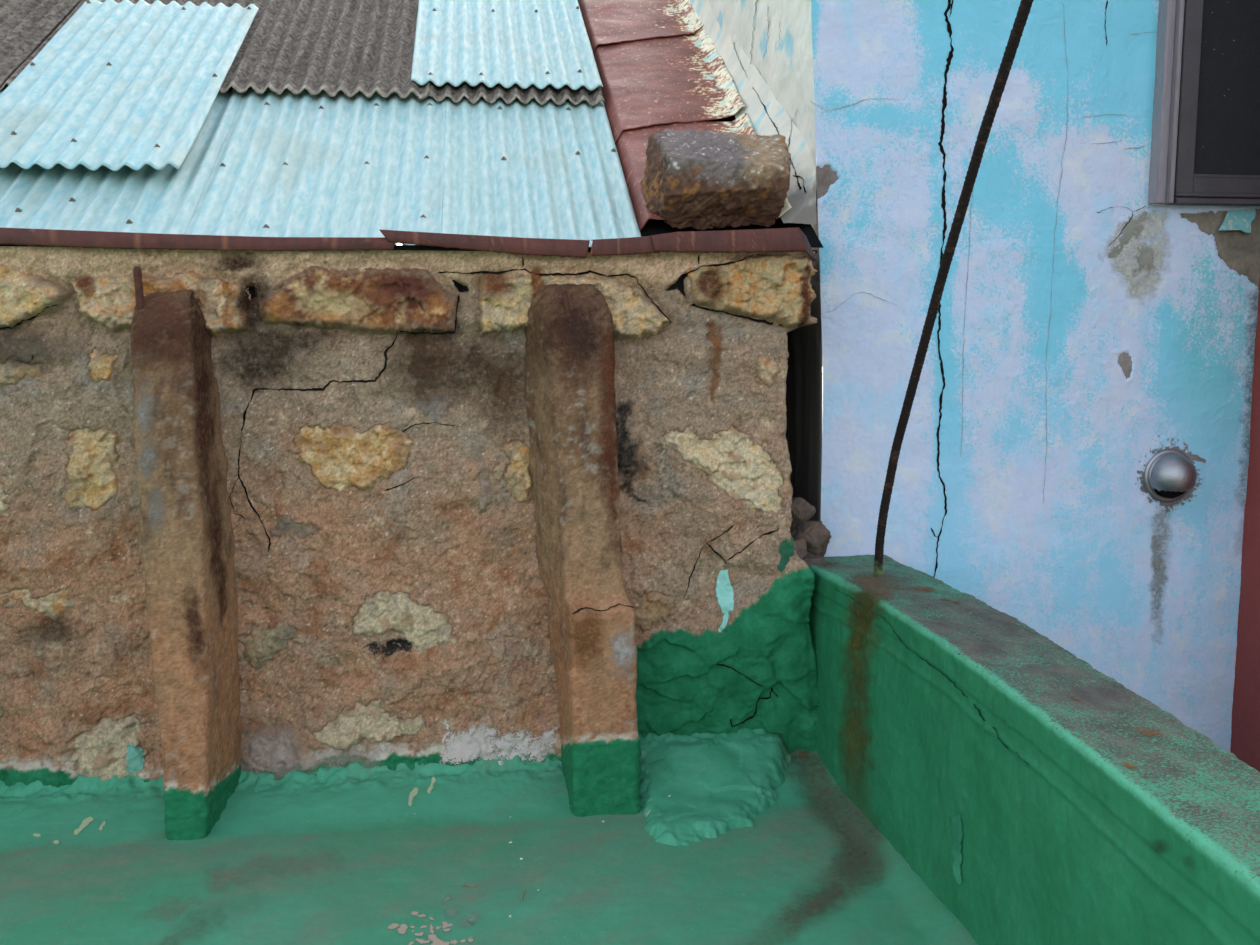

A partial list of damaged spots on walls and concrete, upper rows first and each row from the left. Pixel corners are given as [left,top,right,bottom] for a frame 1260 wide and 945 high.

peeling [816,165,839,207]
crack [931,0,974,578]
peeling [1109,208,1260,297]
crack [229,255,790,551]
peeling [1118,352,1132,379]
crack [684,525,779,598]
damp [1151,513,1168,610]
crack [717,664,778,727]
corrosion [841,593,877,782]